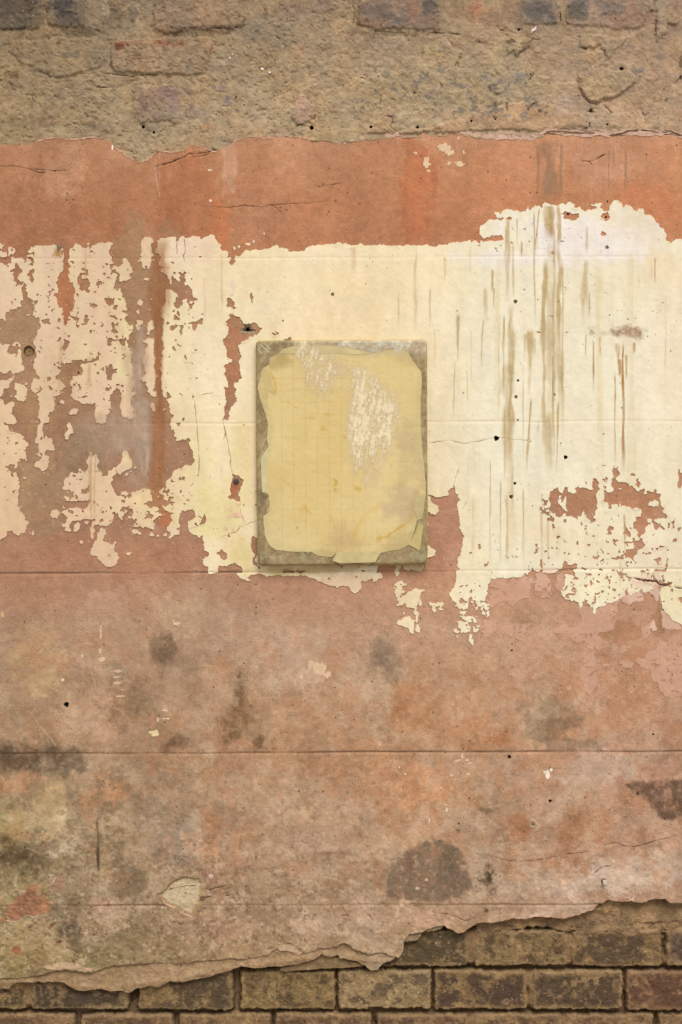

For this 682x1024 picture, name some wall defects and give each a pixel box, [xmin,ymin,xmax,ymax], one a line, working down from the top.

flaking render [0,0,682,163]
crack [156,148,217,167]
damp [506,207,561,253]
damp [527,255,561,352]
peeling [0,237,206,568]
peeling [222,298,291,420]
damp [613,326,642,398]
peeling [424,485,464,567]
peeling [539,465,674,590]
damp [628,780,682,819]
damp [388,840,493,902]
flaking render [0,943,395,993]